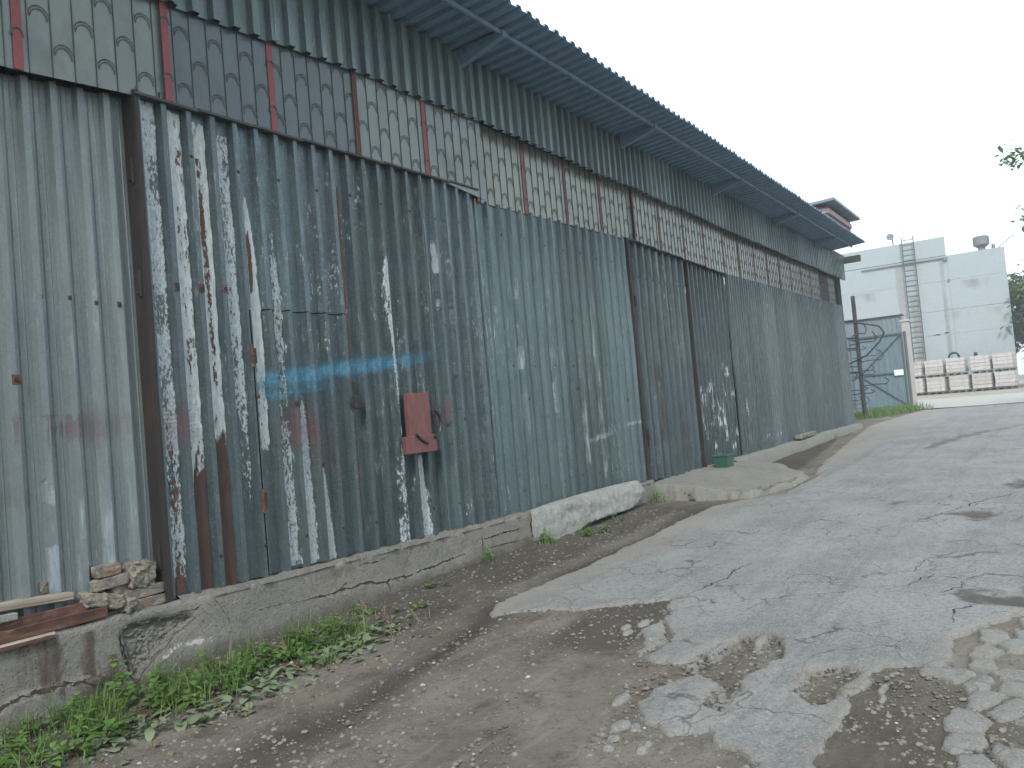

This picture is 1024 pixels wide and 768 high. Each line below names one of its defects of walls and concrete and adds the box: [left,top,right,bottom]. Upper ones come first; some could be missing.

peeling [140,100,337,594]
peeling [379,257,434,542]
peeling [700,353,738,454]
crack [259,518,533,610]
spalling [119,606,199,682]